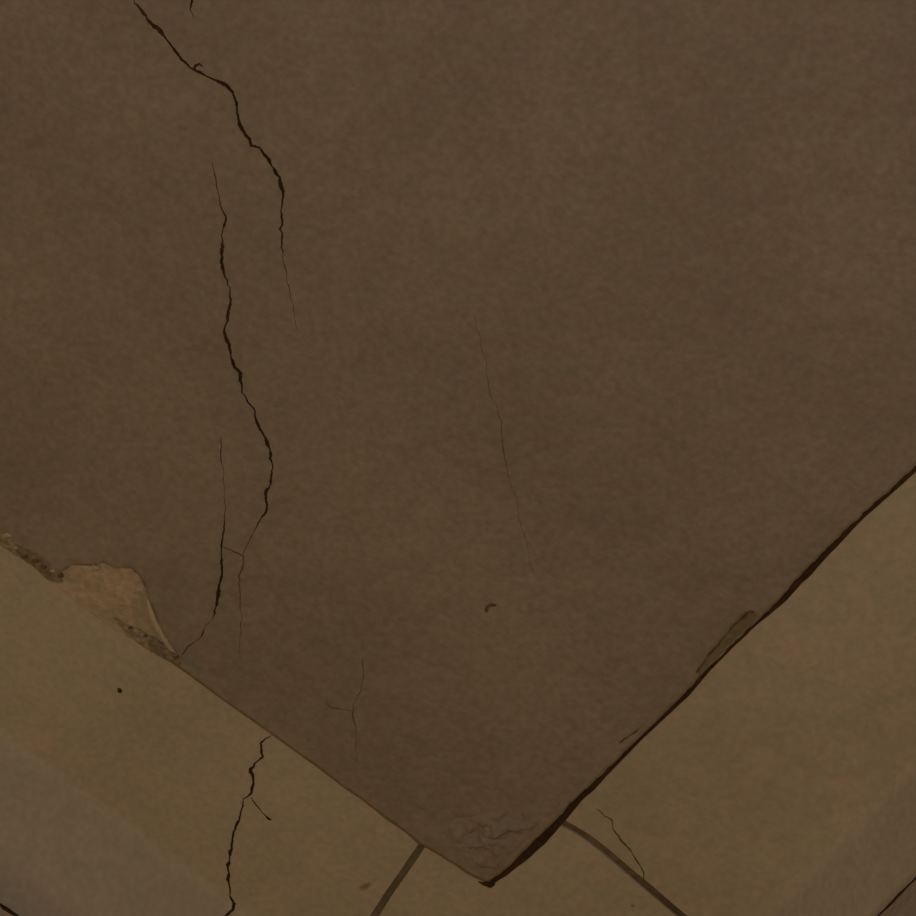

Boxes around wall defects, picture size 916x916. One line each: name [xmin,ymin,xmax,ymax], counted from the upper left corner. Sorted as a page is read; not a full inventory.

crack [134,0,297,328]
crack [182,164,274,655]
spalling [0,533,183,666]
crack [225,736,271,916]